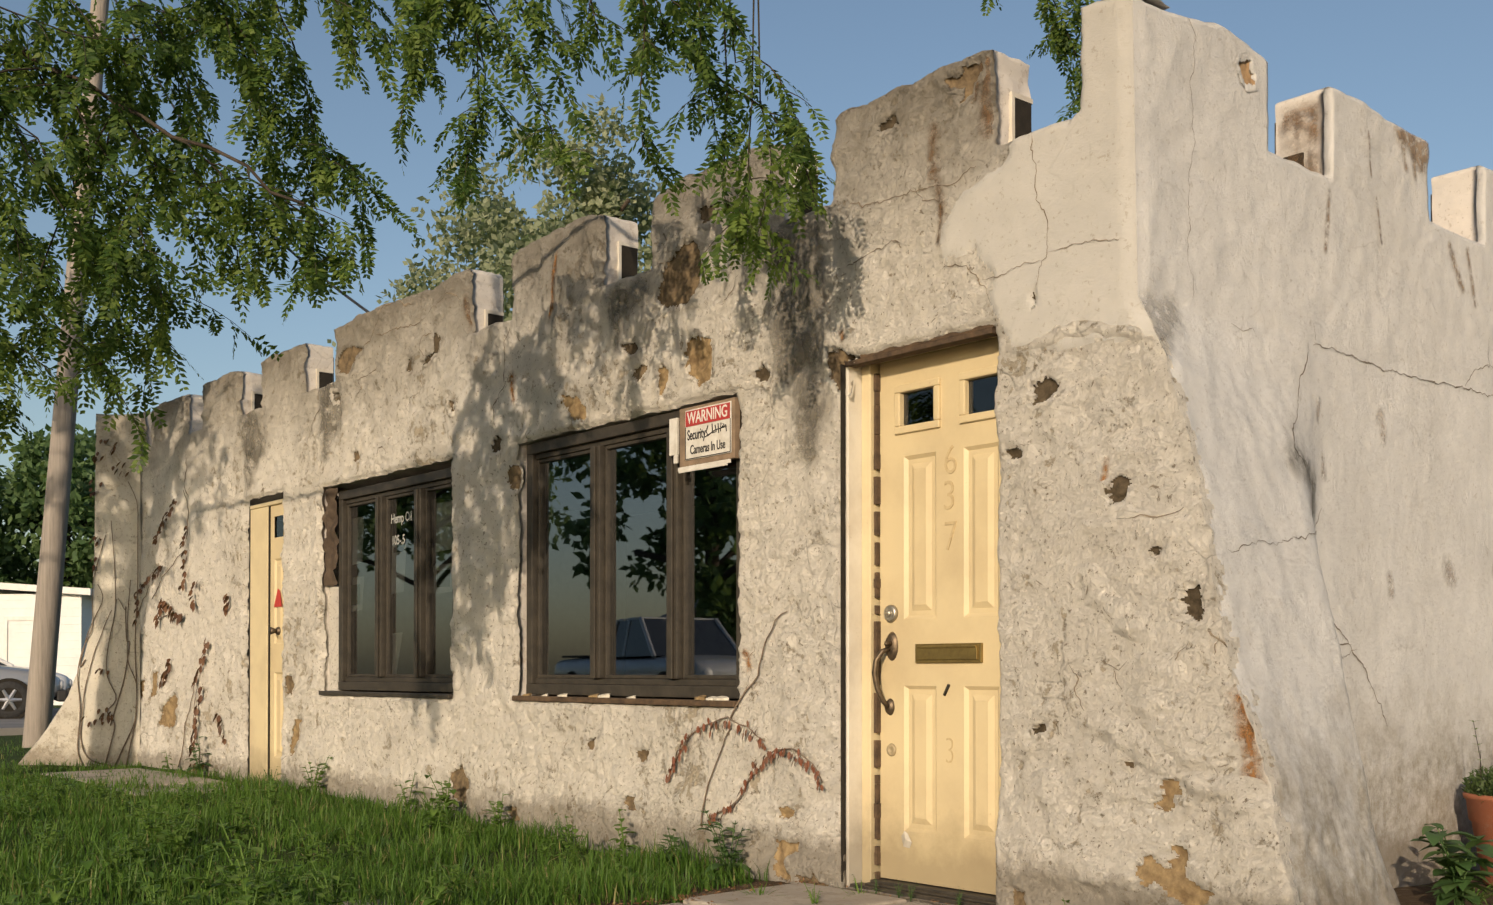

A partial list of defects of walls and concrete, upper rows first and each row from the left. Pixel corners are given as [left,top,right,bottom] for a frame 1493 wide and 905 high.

peeling [1235,52,1259,93]
peeling [652,197,720,315]
crack [942,132,1120,303]
peeling [556,388,590,427]
peeling [618,327,714,404]
water stain [760,222,821,461]
crack [1234,327,1493,552]
spalling [1095,466,1145,516]
spalling [1165,575,1216,631]
peeling [140,666,179,730]
peeling [768,795,836,887]
peeling [1118,773,1231,905]